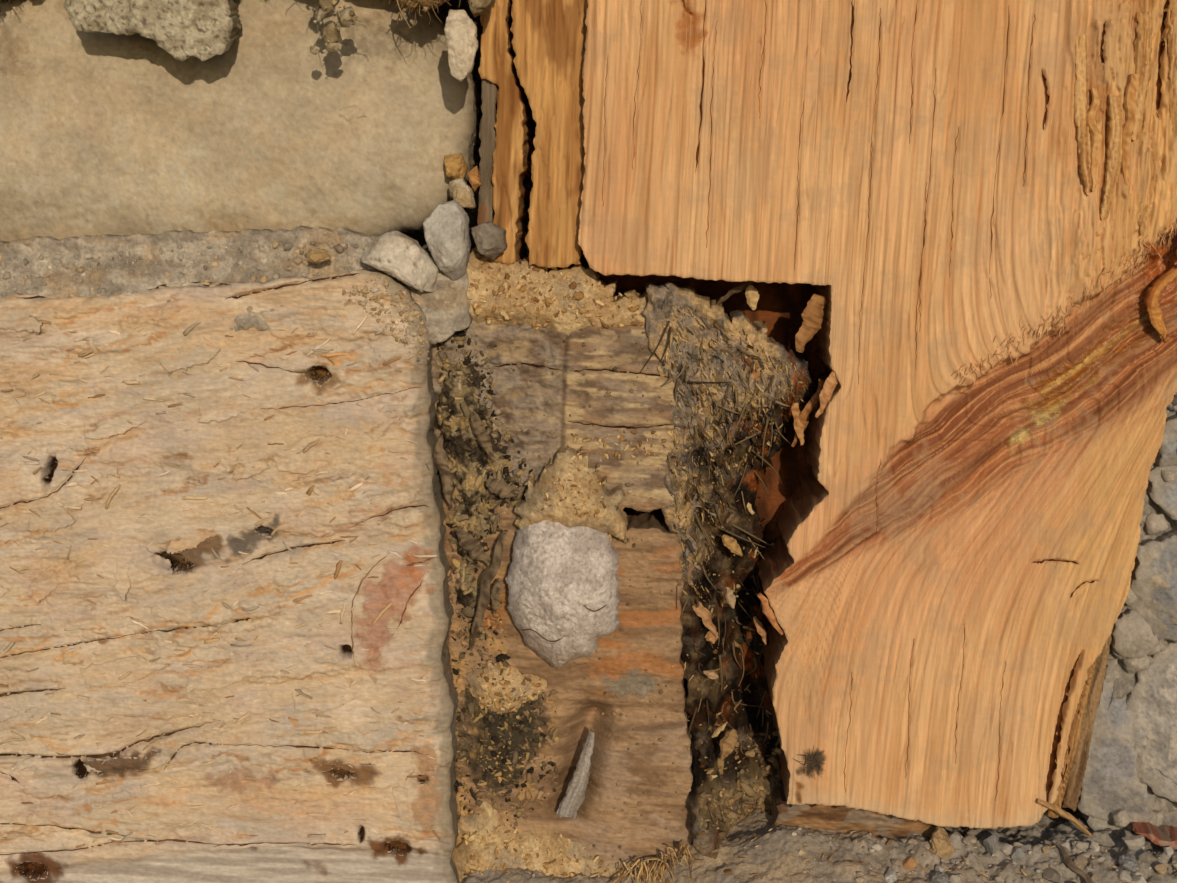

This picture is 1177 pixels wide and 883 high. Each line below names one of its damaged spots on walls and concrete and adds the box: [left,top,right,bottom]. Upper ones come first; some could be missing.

crack [149,273,360,299]
crack [237,361,305,373]
crack [260,387,417,410]
crack [0,457,86,509]
crack [246,505,428,563]
crack [351,554,433,666]
crack [0,618,251,658]
crack [0,688,65,697]
crack [1046,653,1114,802]
crack [0,720,429,783]
crack [0,823,352,855]